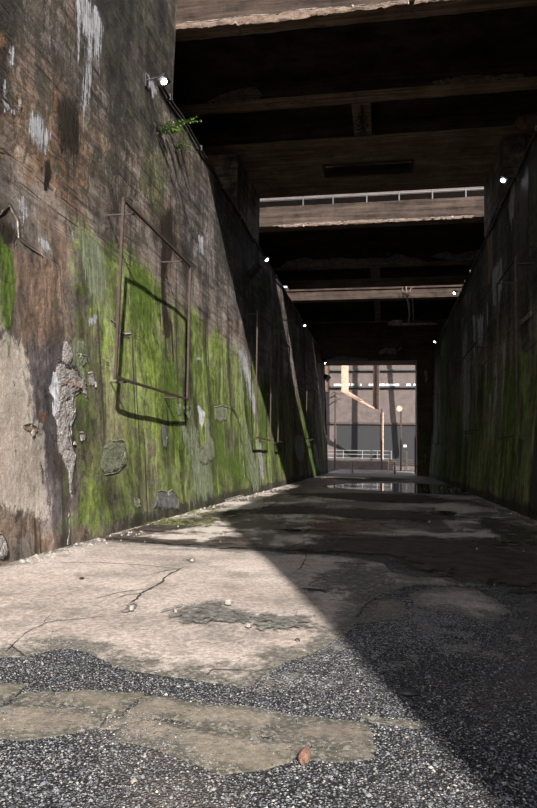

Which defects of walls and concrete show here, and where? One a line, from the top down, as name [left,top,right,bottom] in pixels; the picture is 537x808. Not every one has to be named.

damp [29,0,104,189]
damp [134,209,176,362]
damp [473,230,502,363]
spalling [54,341,97,495]
damp [236,349,258,419]
spalling [0,533,9,559]
crack [2,562,181,656]
spalling [160,599,329,630]